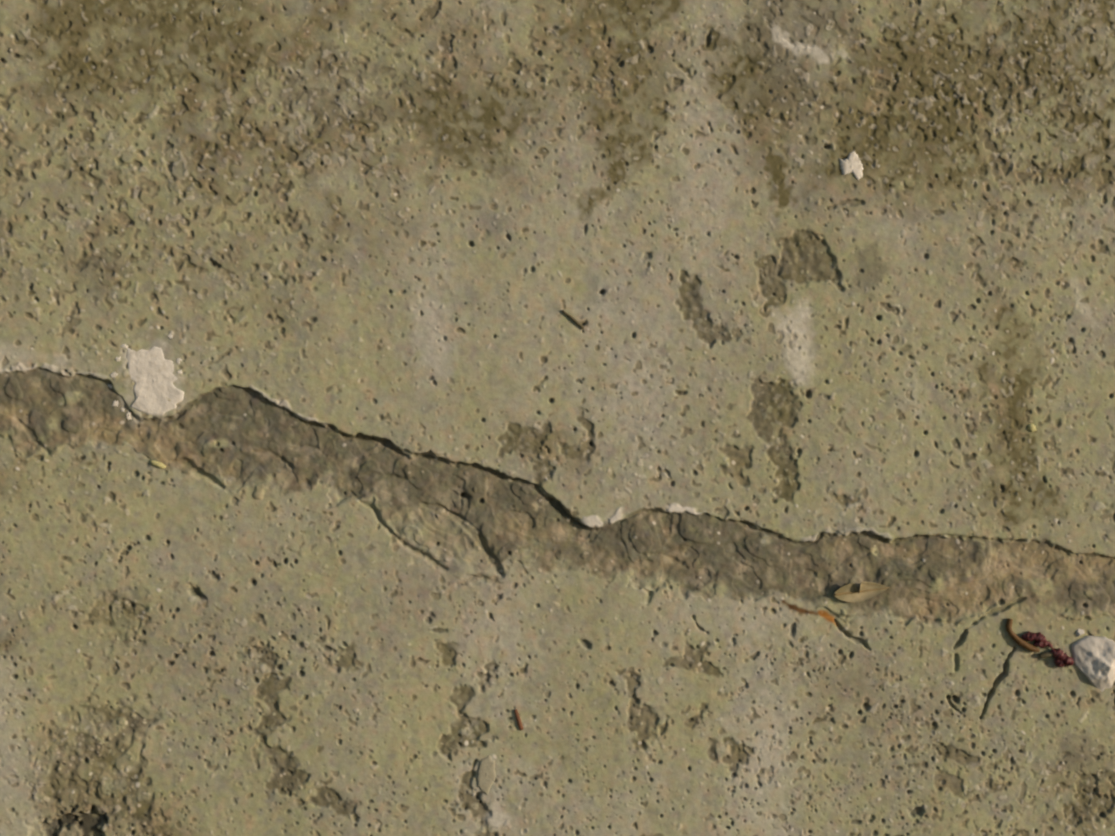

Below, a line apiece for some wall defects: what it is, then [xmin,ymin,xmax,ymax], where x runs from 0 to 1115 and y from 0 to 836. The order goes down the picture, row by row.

water stain [770,24,848,64]
water stain [774,299,816,387]
peeling [497,408,600,487]
peeling [718,377,802,503]
peeling [826,486,858,506]
crack [0,363,1115,720]
spalling [87,583,148,652]